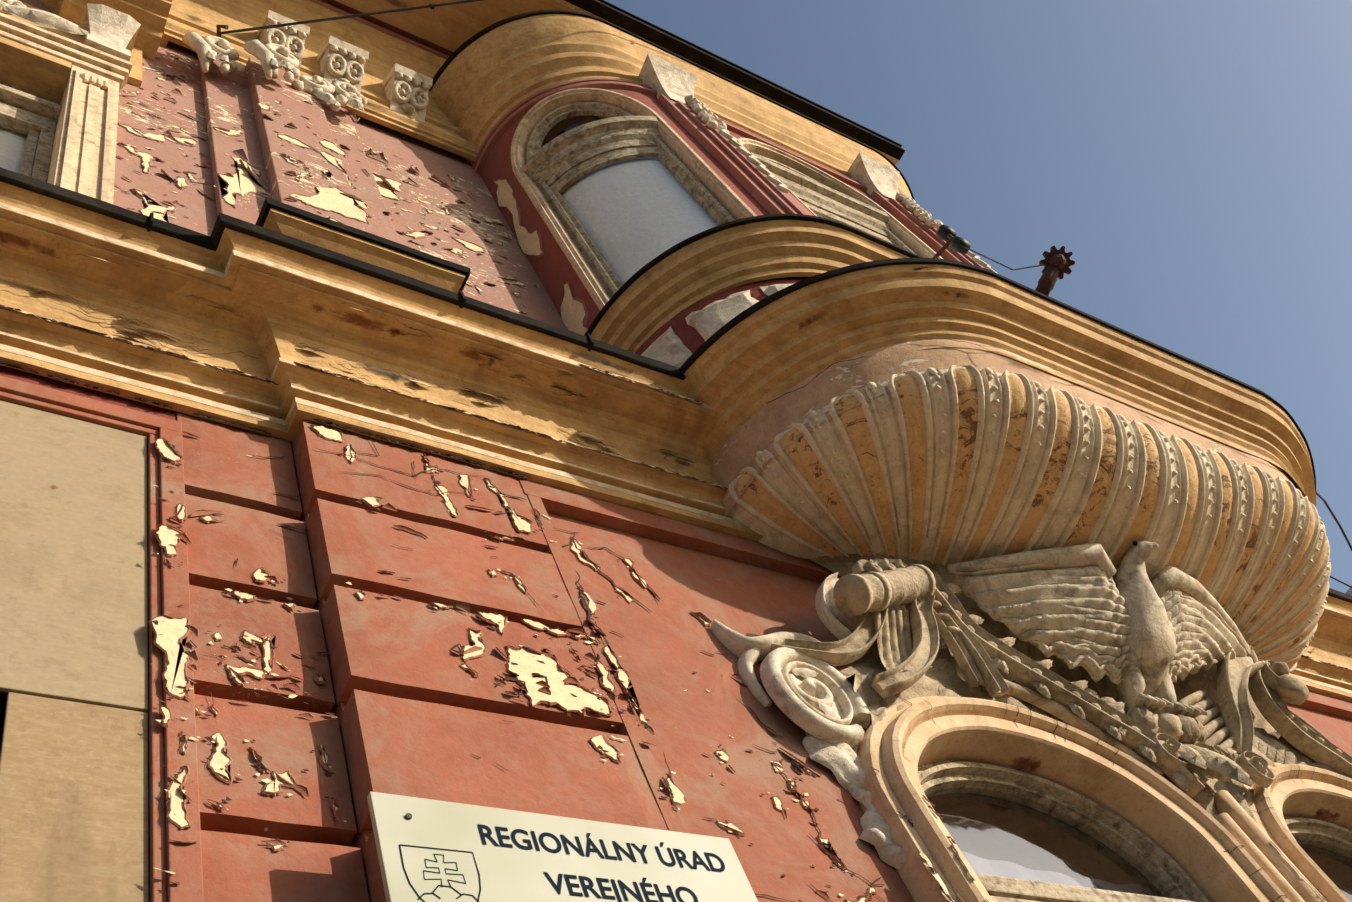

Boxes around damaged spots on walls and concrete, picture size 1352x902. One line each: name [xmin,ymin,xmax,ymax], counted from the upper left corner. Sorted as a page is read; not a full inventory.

peeling [116,49,267,222]
peeling [256,93,546,314]
peeling [551,281,588,336]
peeling [155,438,183,468]
peeling [151,485,224,568]
peeling [310,419,556,542]
peeling [225,567,302,612]
peeling [148,605,347,843]
peeling [430,568,687,810]
peeling [704,735,735,784]
peeling [703,817,754,845]
peeling [746,742,848,872]